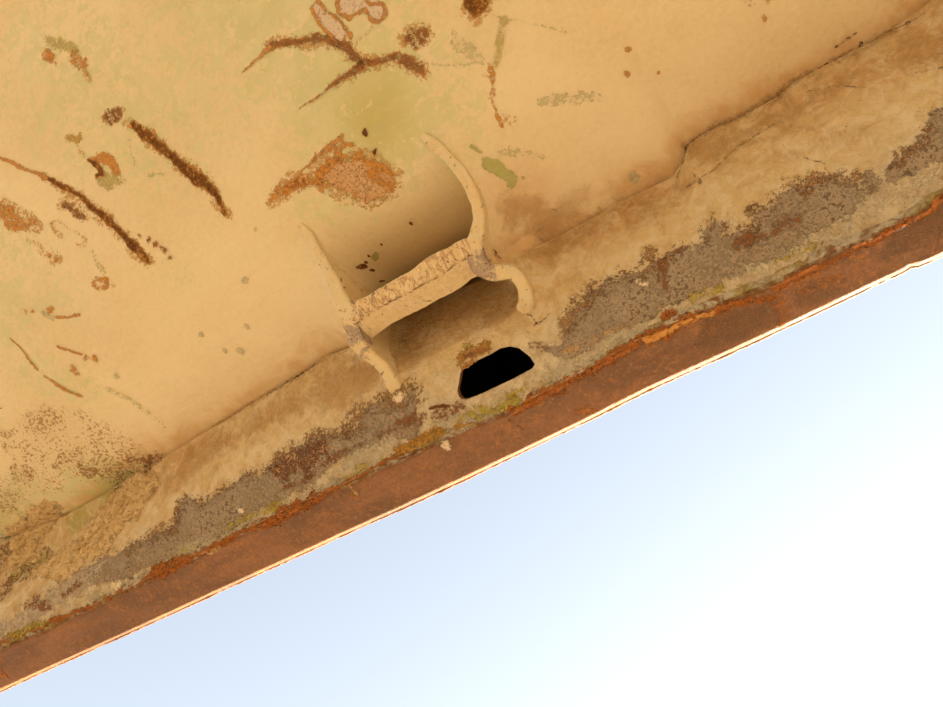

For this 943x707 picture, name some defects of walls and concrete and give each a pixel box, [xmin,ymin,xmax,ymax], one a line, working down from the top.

peeling [309,0,388,41]
corrosion [397,22,435,51]
corrosion [460,0,492,27]
crack [677,13,924,187]
corrosion [0,156,172,267]
corrosion [65,132,124,191]
corrosion [101,106,232,219]
corrosion [265,128,404,209]
corrosion [454,339,492,370]
corrosion [504,193,943,430]
corrosion [0,410,163,519]
corrosion [0,447,411,647]